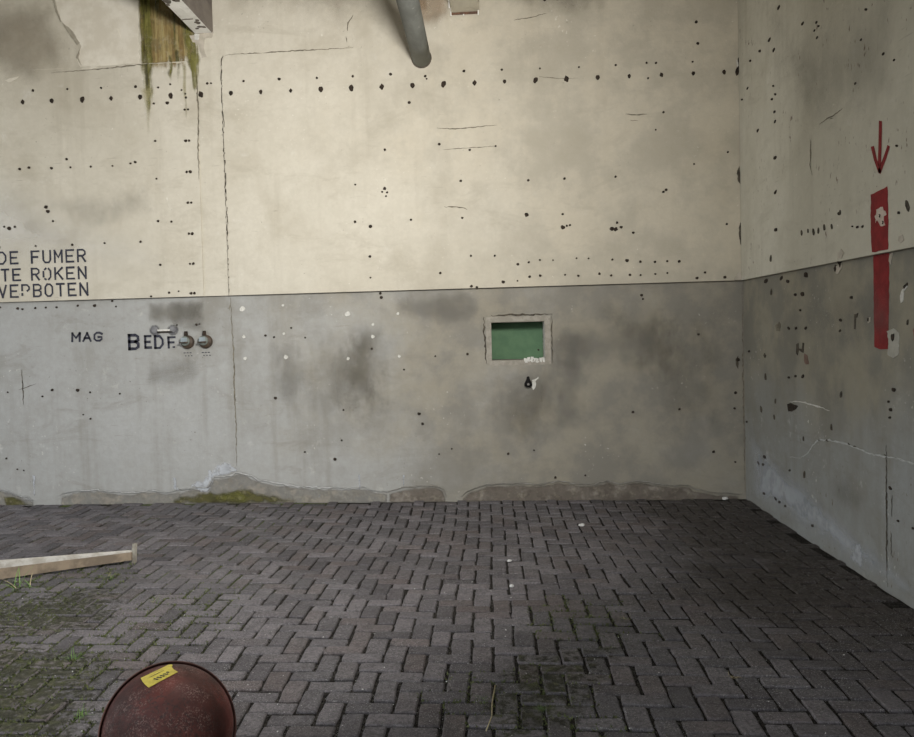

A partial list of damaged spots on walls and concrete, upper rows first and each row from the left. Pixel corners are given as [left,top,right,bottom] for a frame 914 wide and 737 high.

damp [139,0,200,109]
efflorescence [192,463,236,492]